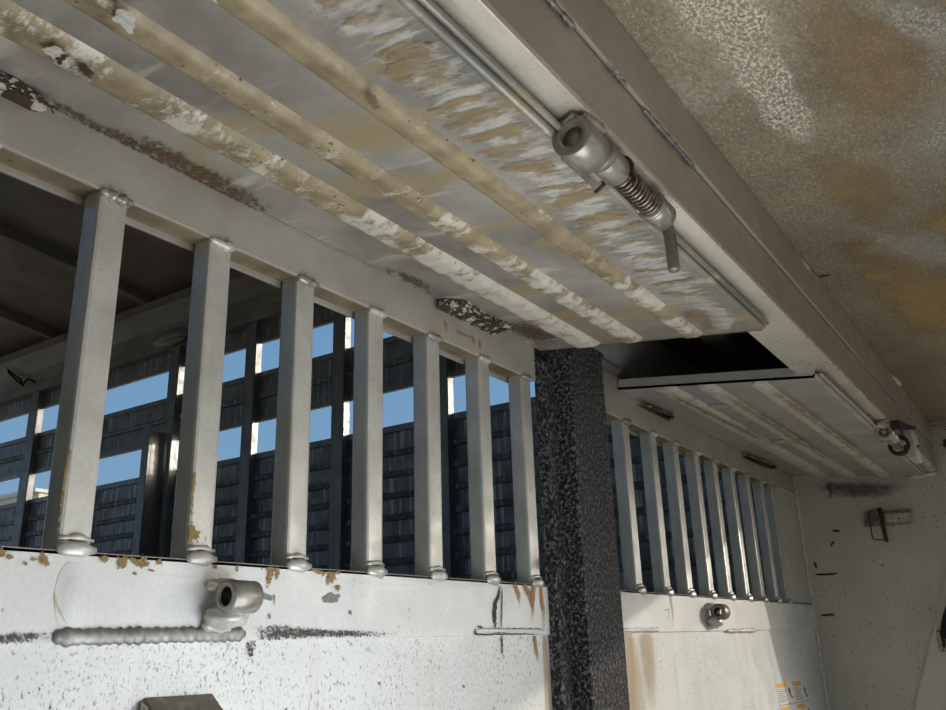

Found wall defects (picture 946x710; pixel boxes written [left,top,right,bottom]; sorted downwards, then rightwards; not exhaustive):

peeling [112,8,142,34]
peeling [42,46,72,68]
water stain [371,27,461,93]
peeling [1,89,59,114]
rust [44,98,271,212]
water stain [429,96,600,208]
water stain [577,209,647,245]
water stain [634,253,705,297]
peeling [437,305,506,335]
rust [100,555,163,575]
rust [266,567,280,588]
rust [513,583,545,622]